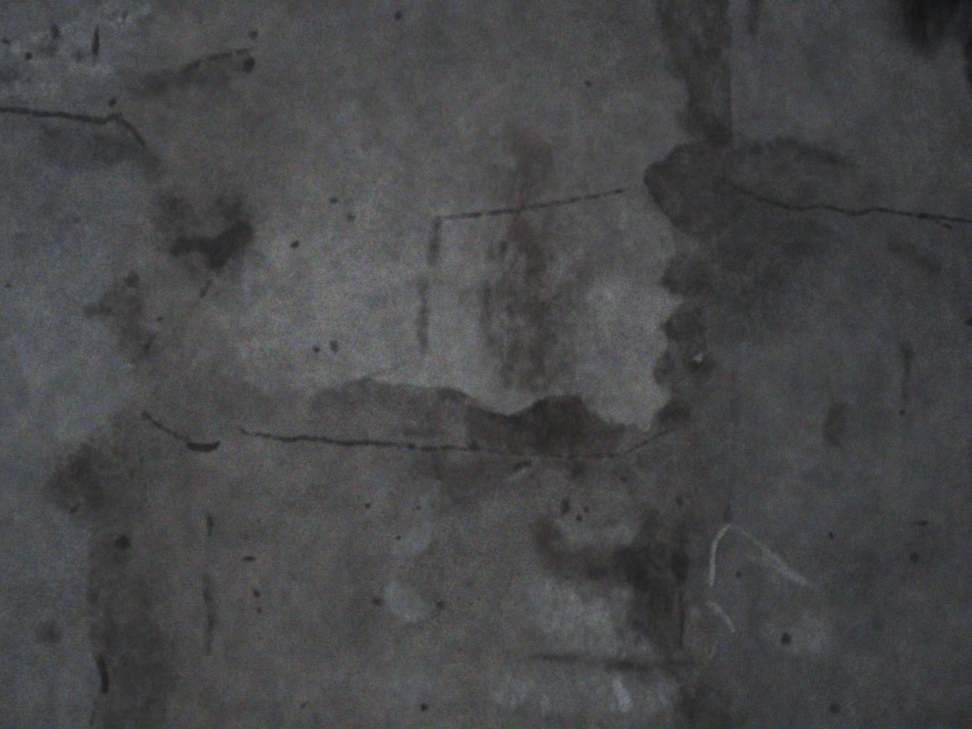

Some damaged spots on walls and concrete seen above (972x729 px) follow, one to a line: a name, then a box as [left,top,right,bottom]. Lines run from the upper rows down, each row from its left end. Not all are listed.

crack [0,99,144,144]
crack [776,203,965,227]
crack [187,442,219,451]
crack [242,431,429,450]